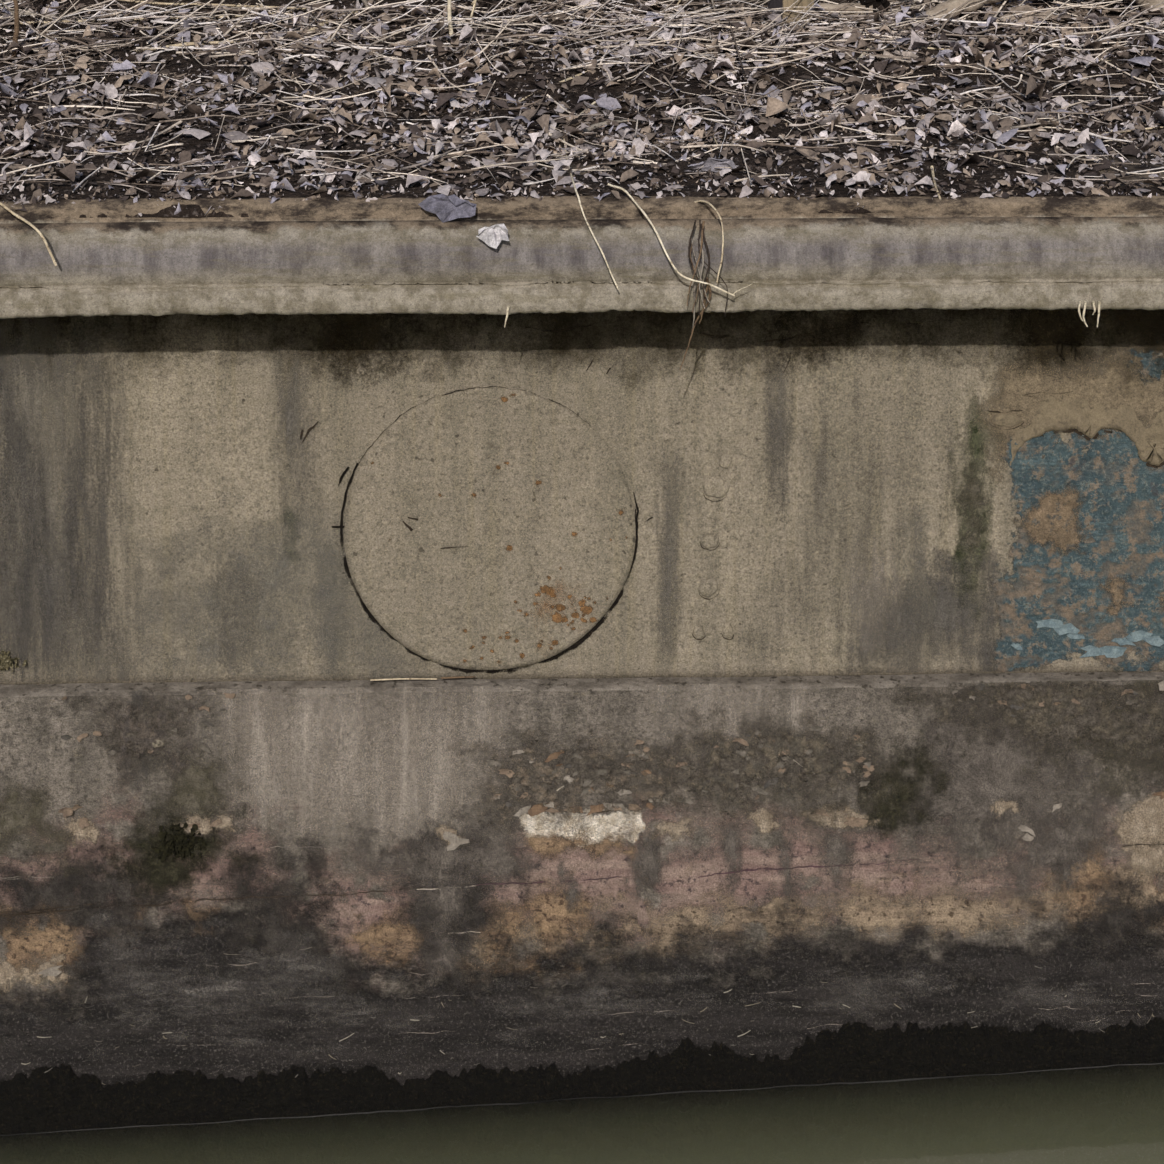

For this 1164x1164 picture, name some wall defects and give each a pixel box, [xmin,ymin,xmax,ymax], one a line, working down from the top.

rust [463,632,525,663]
rust [514,567,608,650]
water stain [0,308,1163,681]
spalling [893,309,1164,766]
water stain [0,686,1164,1088]
peeling [475,710,1049,944]
spalling [1097,792,1164,895]
water stain [828,1142,1164,1164]